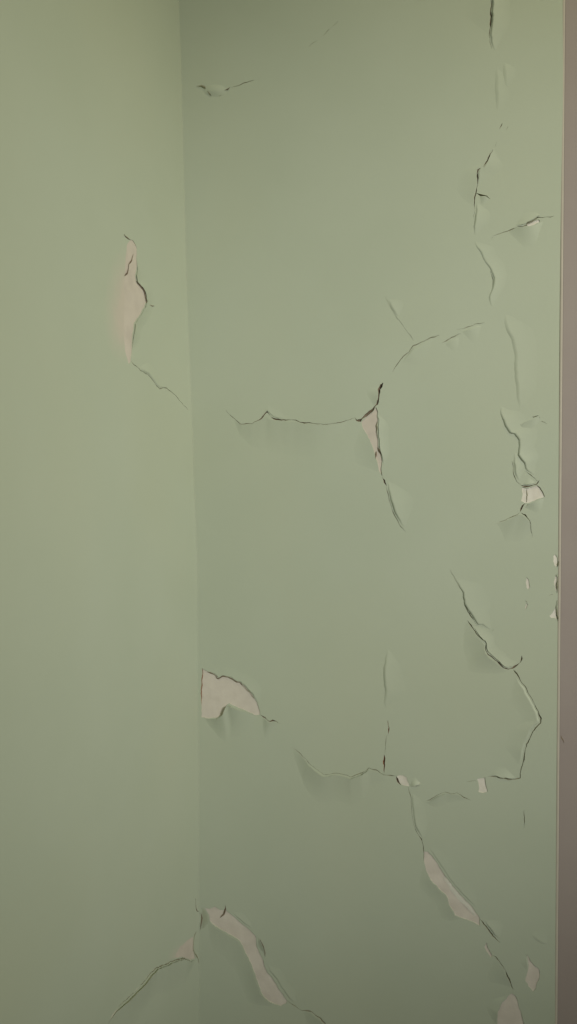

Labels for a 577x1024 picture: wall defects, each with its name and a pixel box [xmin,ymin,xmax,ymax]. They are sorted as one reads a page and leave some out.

crack [466,0,511,51]
crack [457,124,553,248]
peeling [103,234,154,367]
crack [355,383,383,422]
crack [383,479,414,531]
peeling [500,406,545,513]
spalling [201,666,262,742]
crack [383,649,406,769]
crack [452,574,542,780]
spalling [419,842,480,926]
crack [108,898,210,1024]
crack [481,920,513,988]